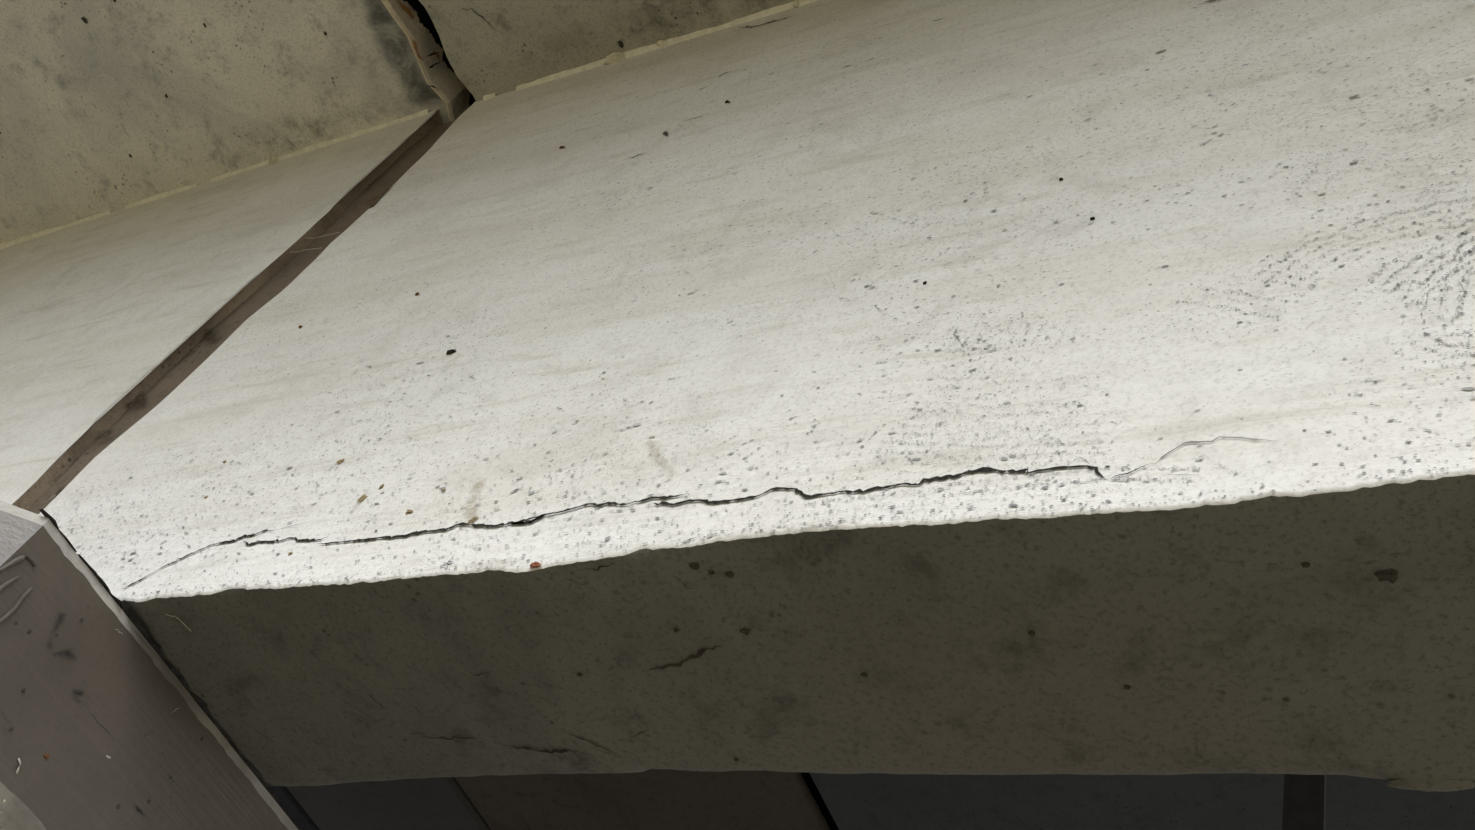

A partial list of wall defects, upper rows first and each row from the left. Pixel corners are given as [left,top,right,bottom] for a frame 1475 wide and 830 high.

crack [123,436,1254,589]